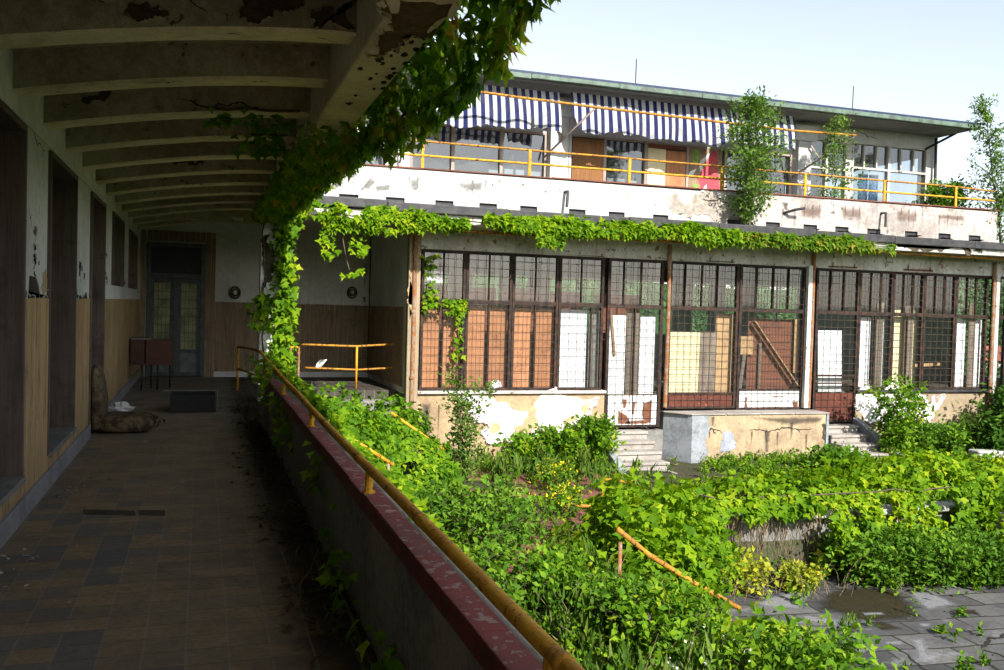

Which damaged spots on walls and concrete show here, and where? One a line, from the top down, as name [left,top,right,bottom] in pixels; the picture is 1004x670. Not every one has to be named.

peeling [126,1,171,23]
peeling [237,0,356,32]
spalling [357,0,461,90]
peeling [26,226,49,298]
peeling [460,387,599,444]
crack [752,427,810,442]